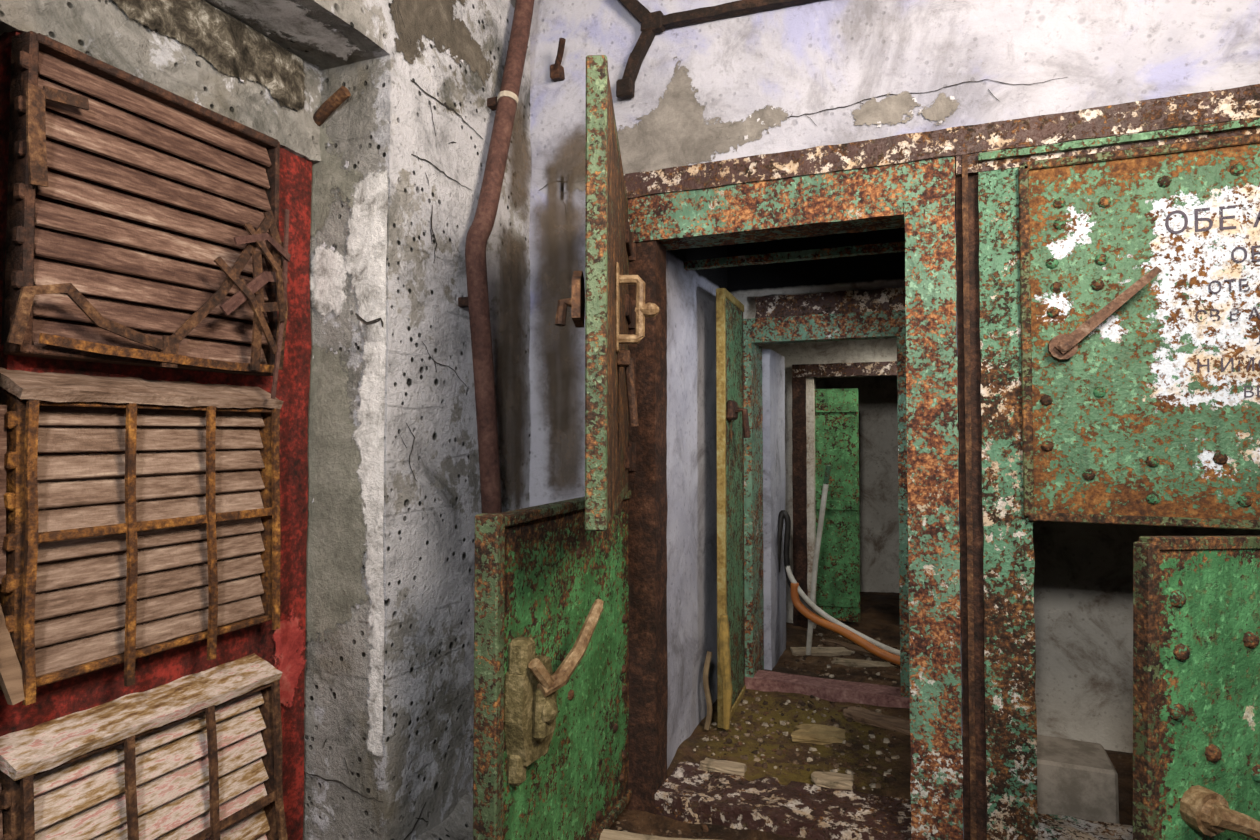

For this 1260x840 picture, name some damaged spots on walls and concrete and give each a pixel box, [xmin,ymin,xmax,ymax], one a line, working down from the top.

peeling [617,57,792,174]